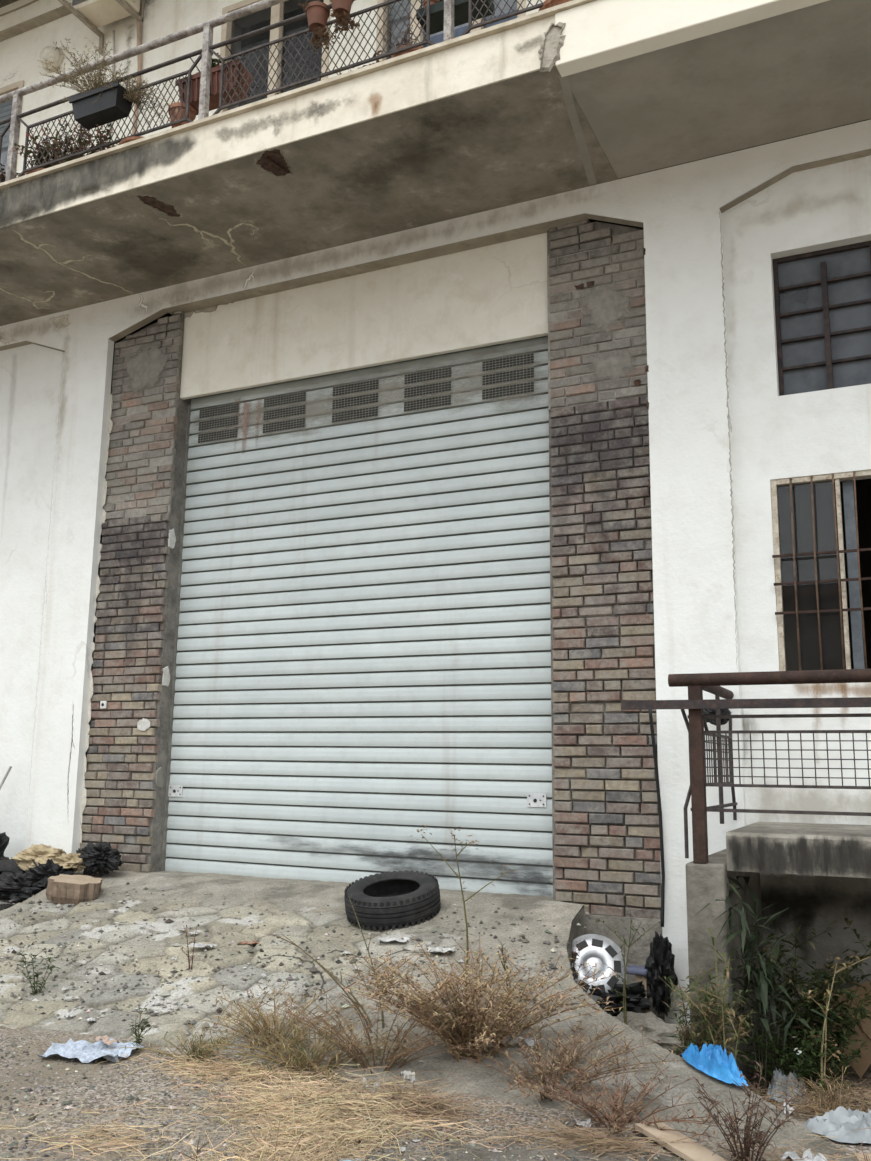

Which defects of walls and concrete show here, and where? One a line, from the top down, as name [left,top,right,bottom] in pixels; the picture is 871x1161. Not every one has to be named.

spalling [519,22,566,72]
damp [219,104,334,139]
spalling [254,147,292,177]
damp [0,137,194,227]
spalling [135,195,182,218]
damp [729,837,871,876]
damp [761,889,834,951]